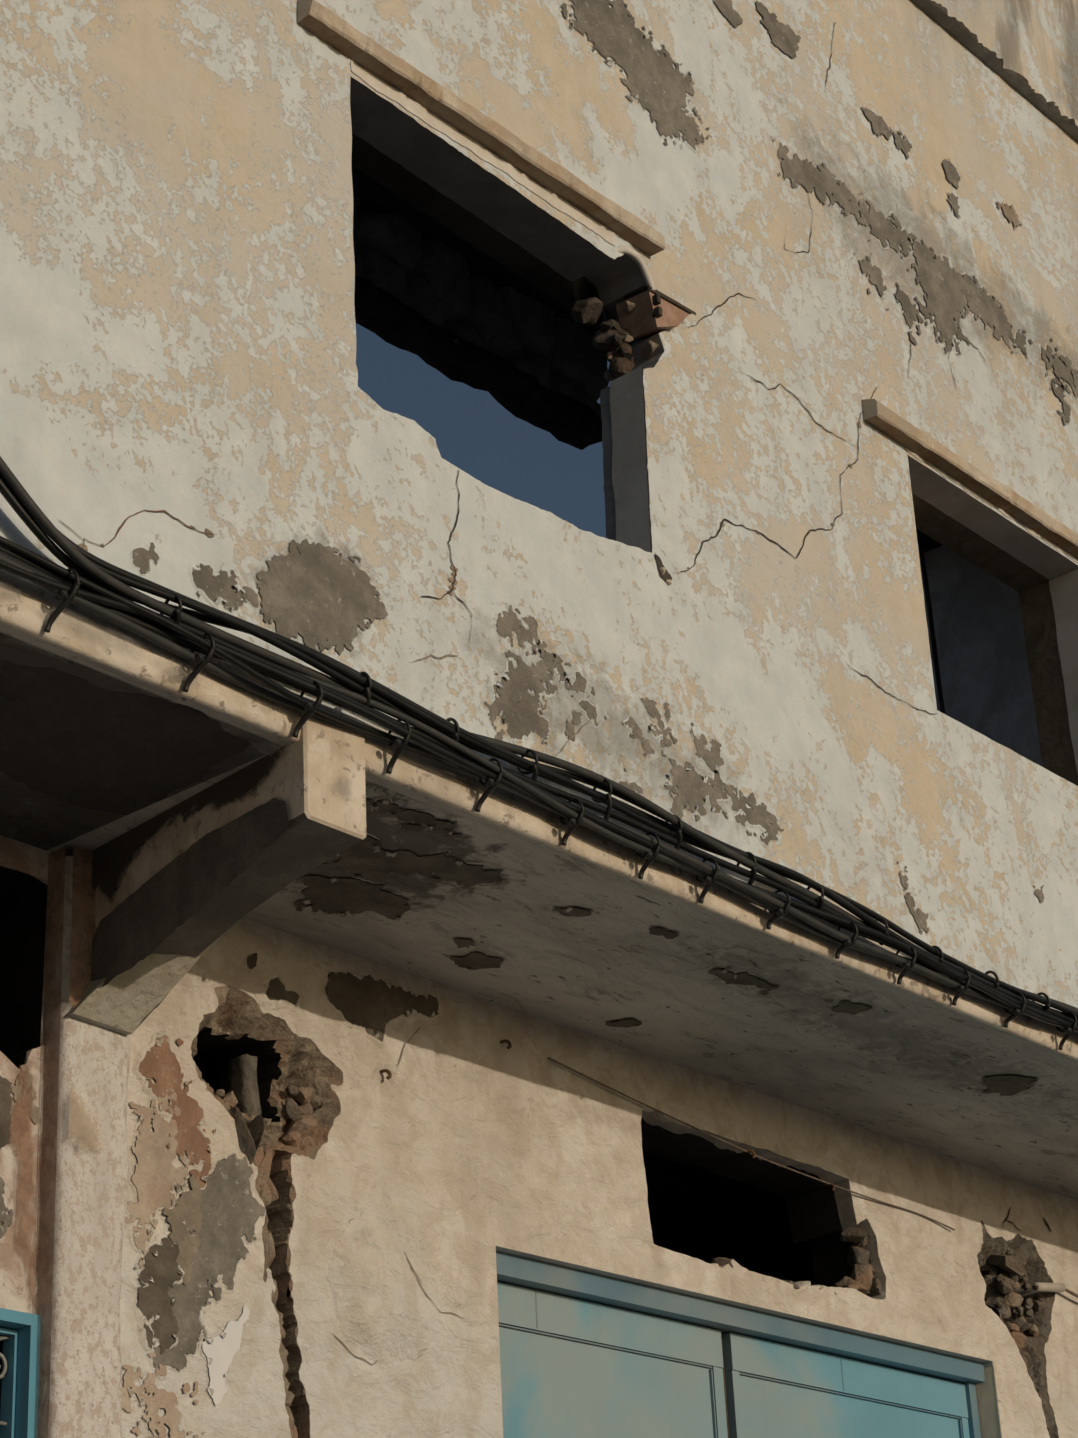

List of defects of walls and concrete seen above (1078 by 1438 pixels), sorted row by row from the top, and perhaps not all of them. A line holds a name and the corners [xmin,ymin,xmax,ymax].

peeling [561,0,712,154]
crack [688,293,756,328]
peeling [771,136,1078,427]
crack [60,510,215,551]
crack [413,469,472,662]
crack [680,375,878,572]
peeling [483,604,784,848]
peeling [290,796,505,922]
flaking render [322,967,441,1049]
spalling [121,953,343,1438]
spalling [833,1227,881,1297]
crack [1002,1206,1052,1232]